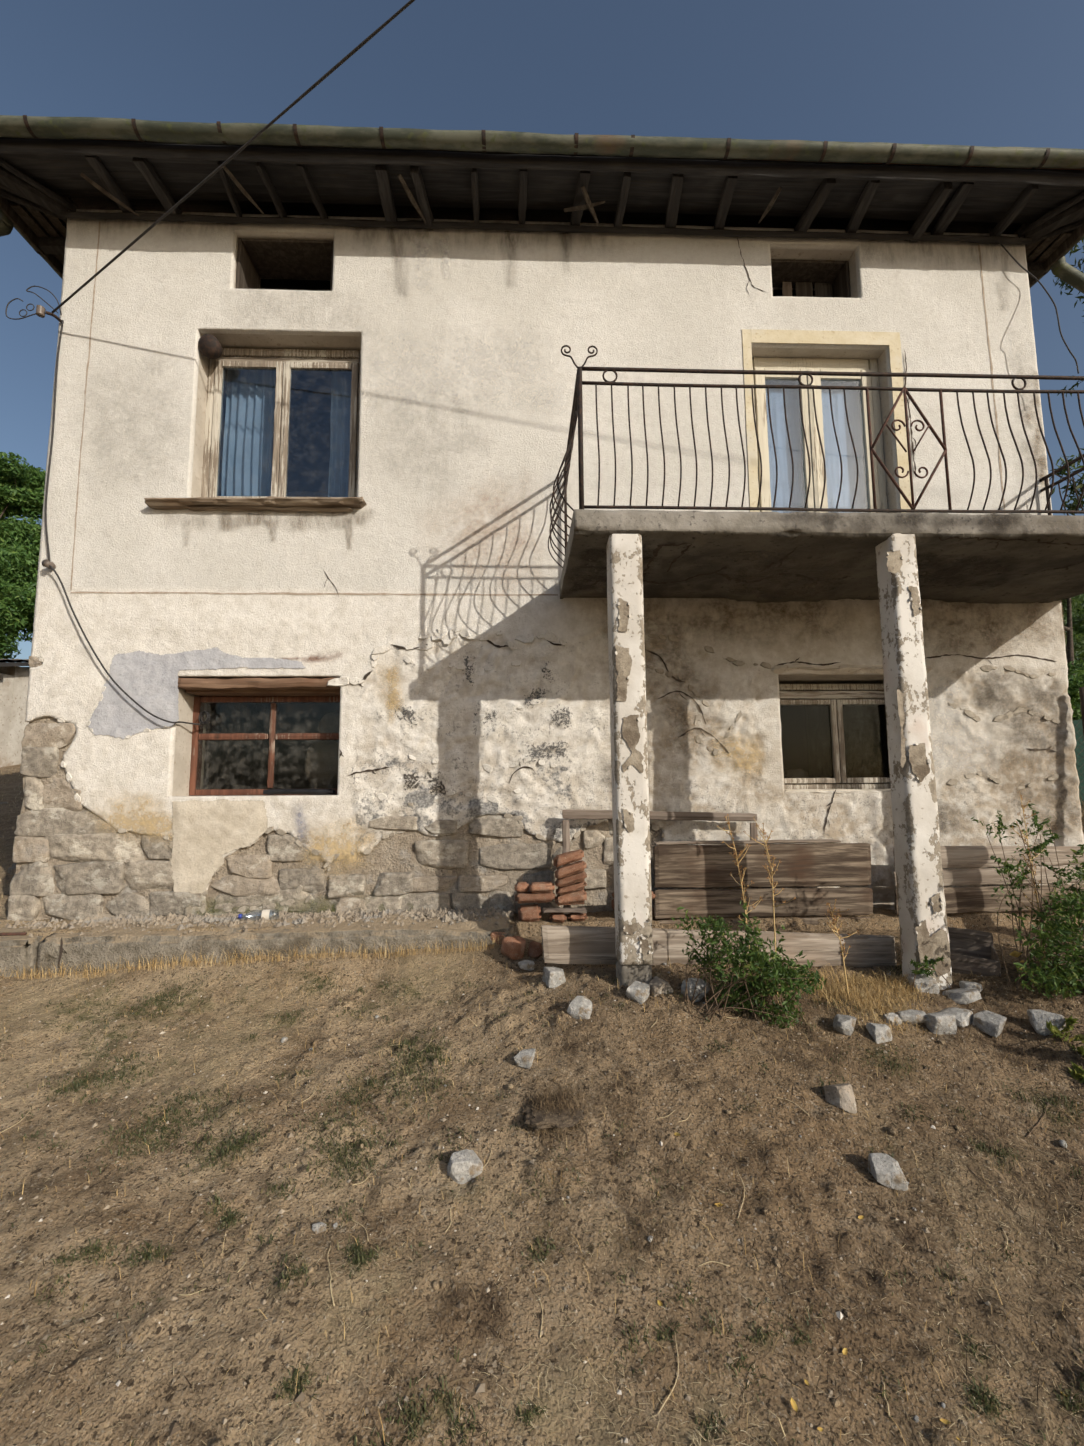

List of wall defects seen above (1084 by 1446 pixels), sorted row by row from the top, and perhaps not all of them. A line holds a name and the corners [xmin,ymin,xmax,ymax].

crack [737,238,769,294]
peeling [327,625,566,687]
peeling [615,598,743,773]
crack [645,649,729,754]
peeling [897,689,931,782]
crack [927,654,1057,665]
spalling [7,647,665,961]
peeling [915,893,951,977]